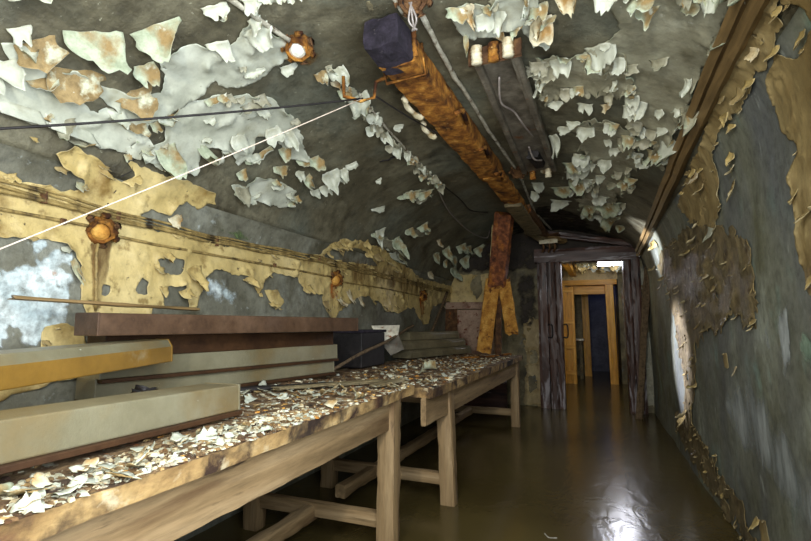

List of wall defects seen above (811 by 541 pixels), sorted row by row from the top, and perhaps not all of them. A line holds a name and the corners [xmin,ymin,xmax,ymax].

corrosion [401,95,437,140]
peeling [445,0,745,233]
peeling [0,0,489,325]
peeling [574,263,622,274]
peeling [640,0,811,541]
peeling [41,323,86,347]
peeling [522,317,541,406]